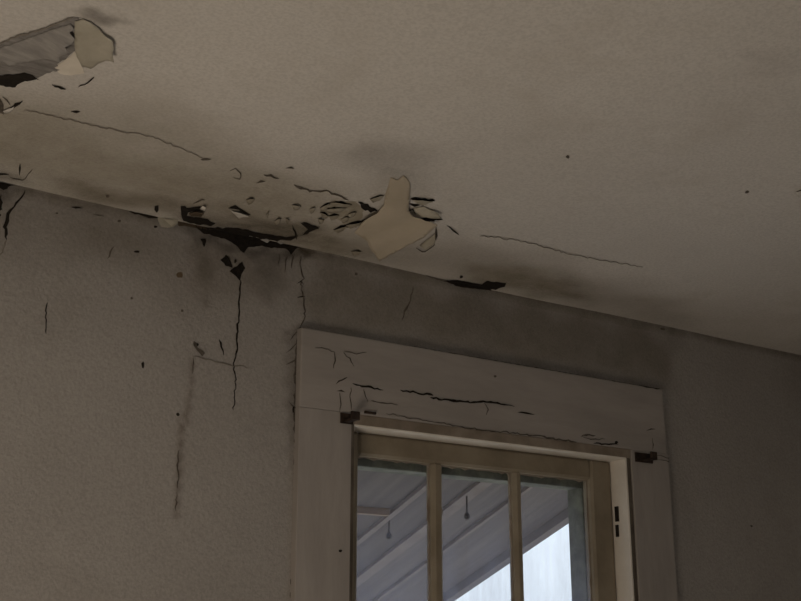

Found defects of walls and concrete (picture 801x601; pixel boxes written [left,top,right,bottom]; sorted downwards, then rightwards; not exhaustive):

peeling [0,17,114,88]
peeling [0,97,23,114]
crack [0,191,25,255]
water stain [0,165,32,216]
flaking render [129,199,215,228]
water stain [178,221,318,280]
peeling [292,185,384,233]
peeling [409,197,443,252]
water stain [426,275,506,290]
crack [195,280,246,408]
crack [352,383,618,445]